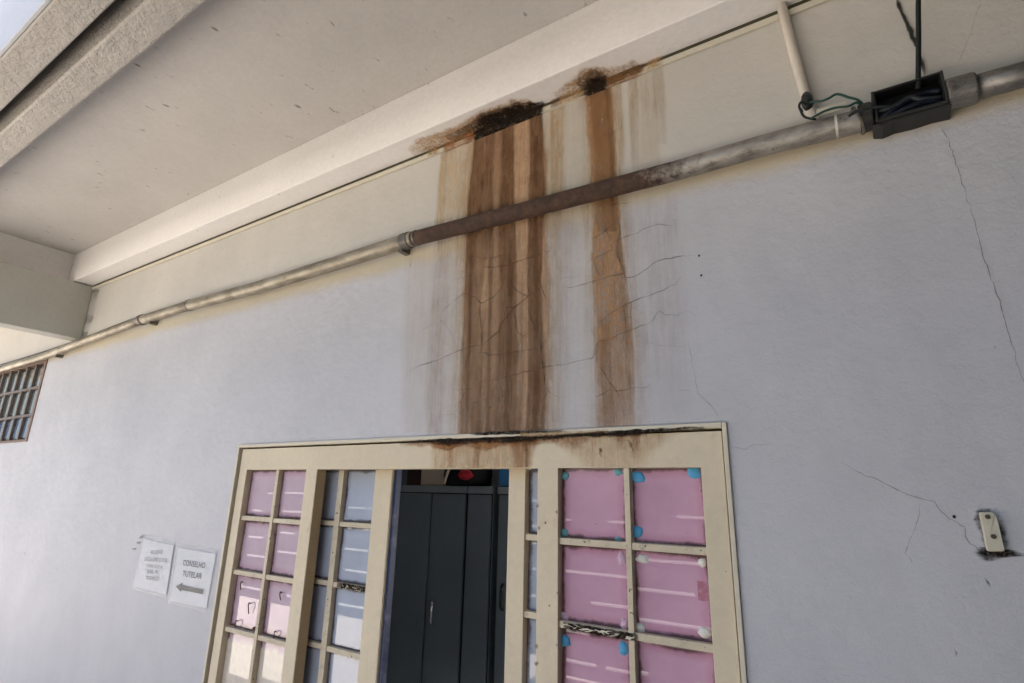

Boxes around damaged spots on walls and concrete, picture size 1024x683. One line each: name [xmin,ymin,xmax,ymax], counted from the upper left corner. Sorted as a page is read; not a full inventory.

corrosion [464,115,548,217]
water stain [417,57,660,154]
corrosion [585,88,615,183]
corrosion [414,214,552,468]
crack [422,254,549,403]
crack [578,203,643,410]
corrosion [592,196,632,407]
crack [976,229,1018,366]